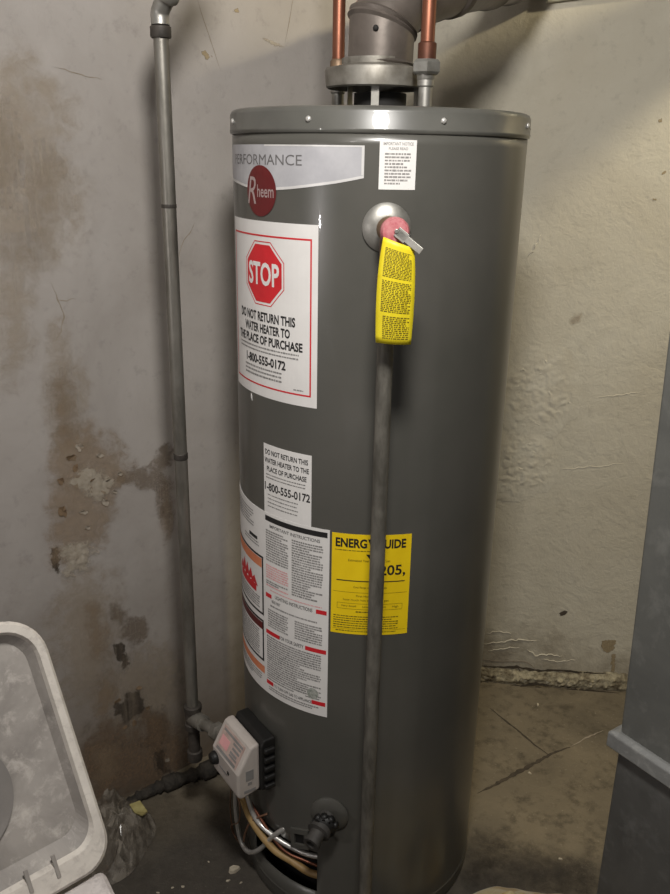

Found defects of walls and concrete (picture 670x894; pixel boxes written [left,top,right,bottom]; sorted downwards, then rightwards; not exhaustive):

leakage [118,444,174,528]
flaking render [50,547,61,573]
flaking render [113,642,130,668]
flaking render [480,631,628,691]
flaking render [114,686,150,729]
crack [478,708,603,793]